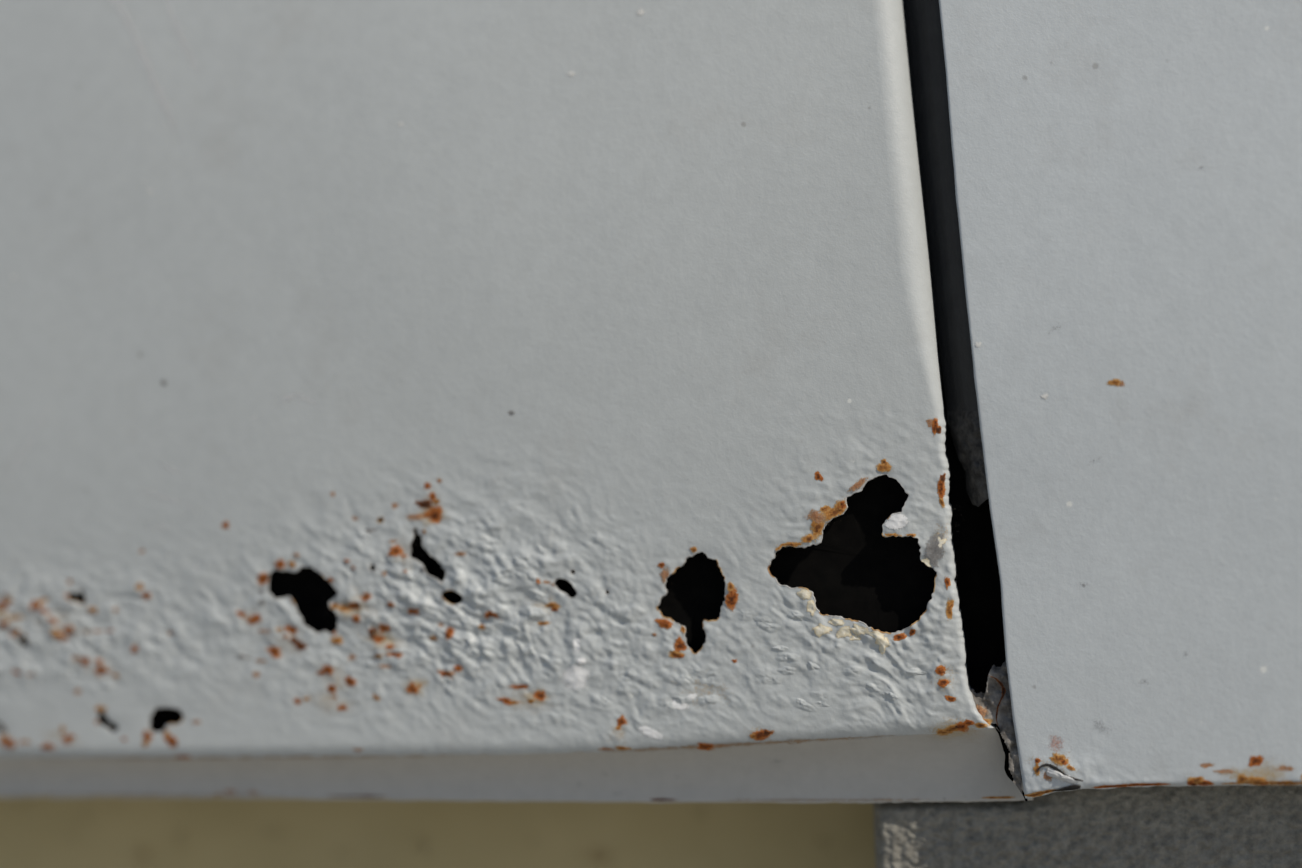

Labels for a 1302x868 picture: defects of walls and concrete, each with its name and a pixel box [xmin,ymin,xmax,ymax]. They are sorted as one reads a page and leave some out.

corrosion [926,418,942,436]
corrosion [391,478,450,535]
corrosion [776,459,894,551]
peeling [884,513,908,530]
peeling [922,531,947,569]
corrosion [936,472,949,548]
corrosion [228,559,420,722]
peeling [797,588,891,655]
corrosion [944,577,954,620]
corrosion [495,684,558,720]
corrosion [981,735,1080,799]
corrosion [1091,752,1302,789]